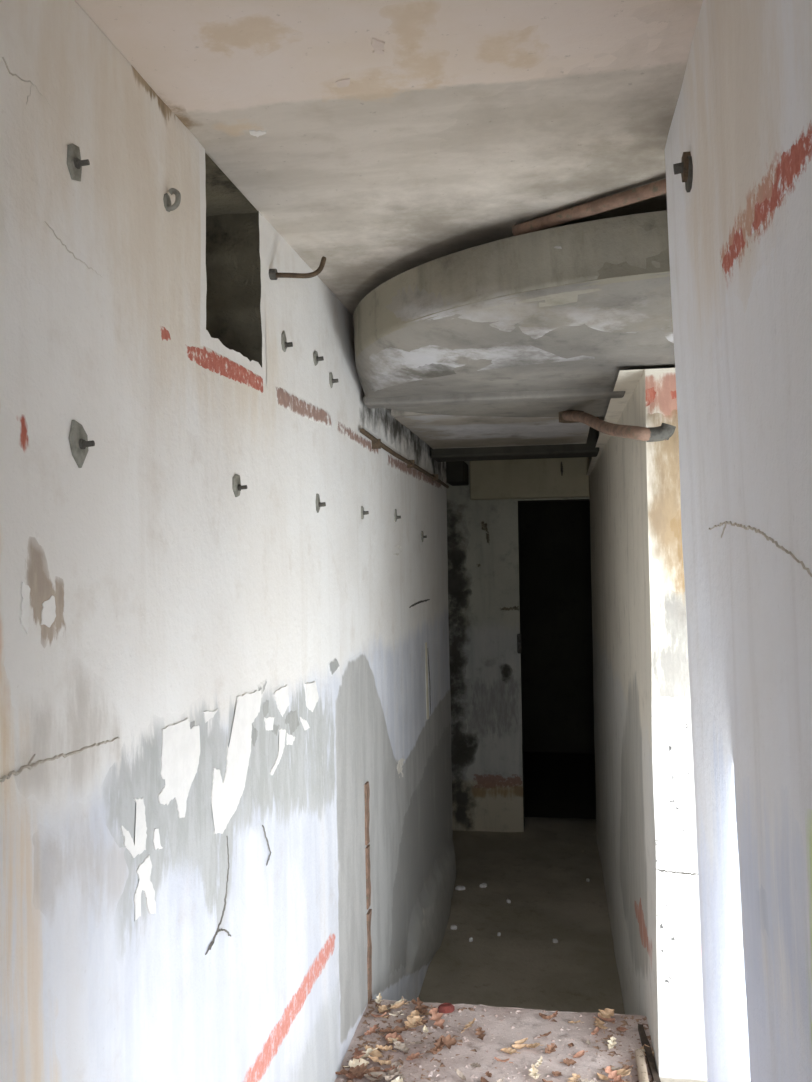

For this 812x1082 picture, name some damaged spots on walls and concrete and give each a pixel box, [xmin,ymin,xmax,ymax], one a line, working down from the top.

corrosion [15,414,30,456]
peeling [19,536,69,649]
leakage [264,0,812,1082]
crack [709,521,812,577]
corrosion [0,584,62,1082]
crack [0,737,118,783]
peeling [100,657,340,969]
leakage [241,821,271,996]